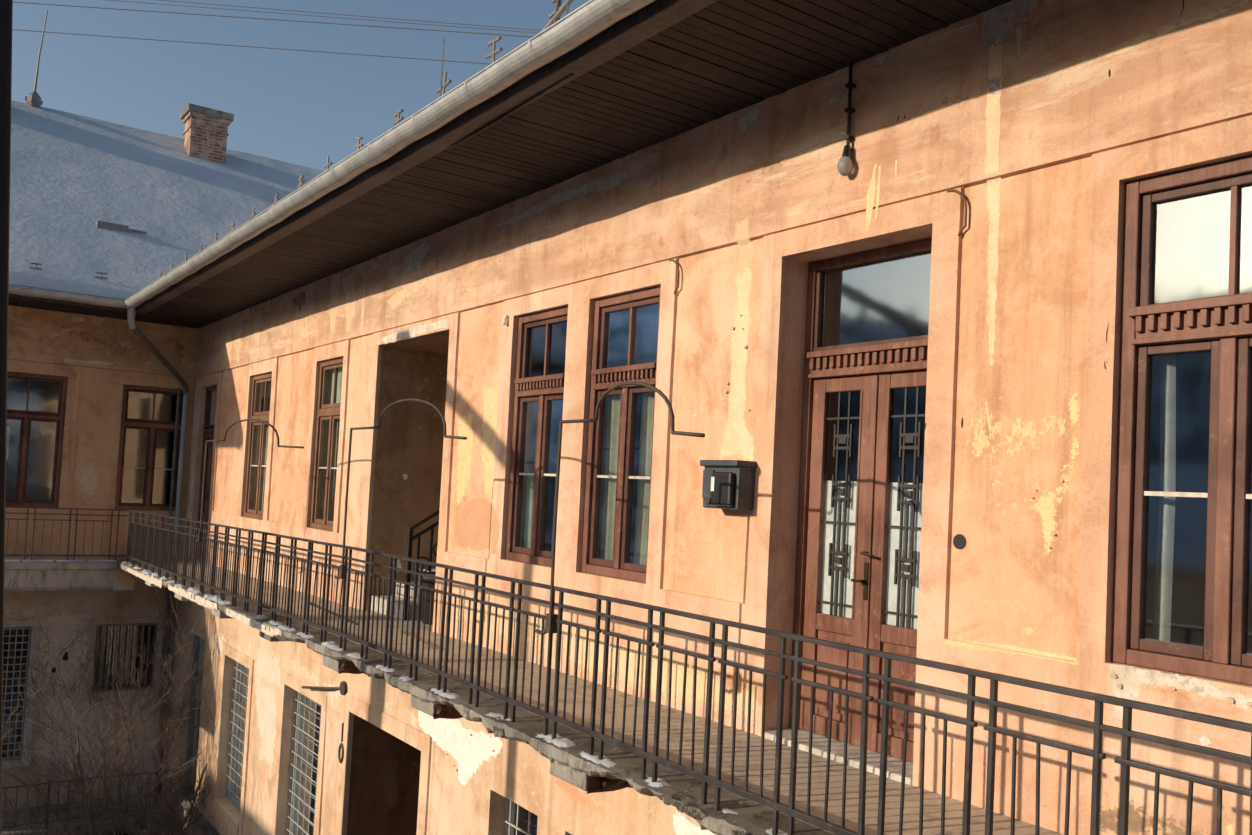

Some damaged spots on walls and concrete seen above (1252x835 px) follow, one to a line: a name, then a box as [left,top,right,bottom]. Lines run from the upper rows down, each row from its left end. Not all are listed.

peeling [980,0,1030,45]
peeling [720,267,754,461]
peeling [1024,386,1081,555]
peeling [1109,665,1252,723]
peeling [418,704,503,786]
peeling [661,794,716,835]